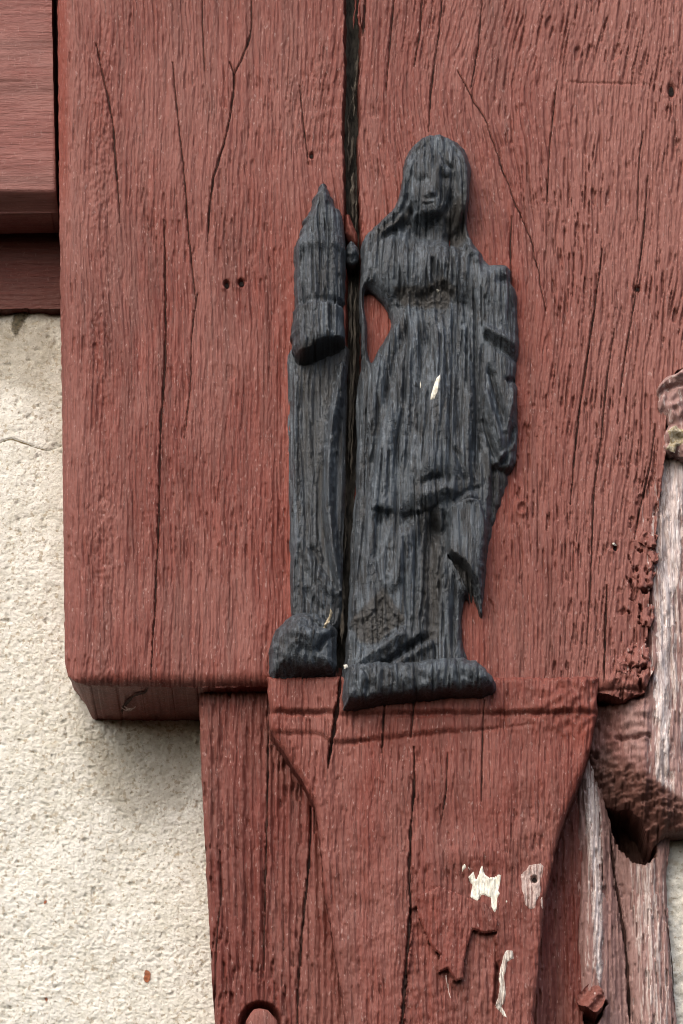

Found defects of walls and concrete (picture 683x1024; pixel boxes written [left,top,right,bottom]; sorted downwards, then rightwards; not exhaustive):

crack [96,44,120,215]
crack [414,2,546,311]
crack [121,1,252,714]
crack [328,0,366,765]
peeling [639,458,683,754]
crack [297,808,312,1024]
crack [401,703,415,1024]
peeling [416,864,507,998]
peeling [495,950,513,1017]
peeling [521,863,544,909]